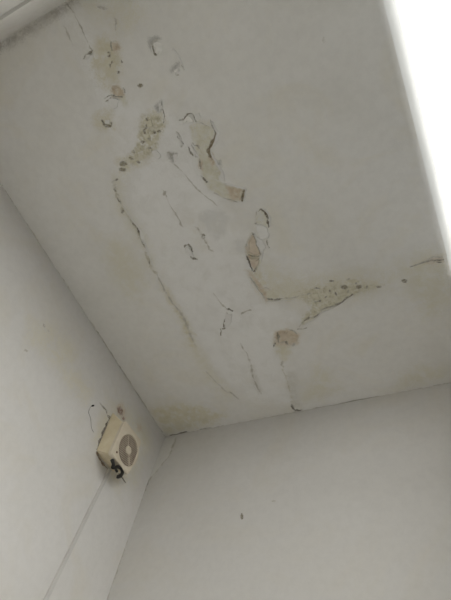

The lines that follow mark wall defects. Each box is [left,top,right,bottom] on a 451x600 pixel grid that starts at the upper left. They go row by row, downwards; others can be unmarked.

peeling [179,113,247,202]
crack [111,178,195,344]
crack [213,293,251,336]
peeling [235,208,385,366]
crack [411,254,445,267]